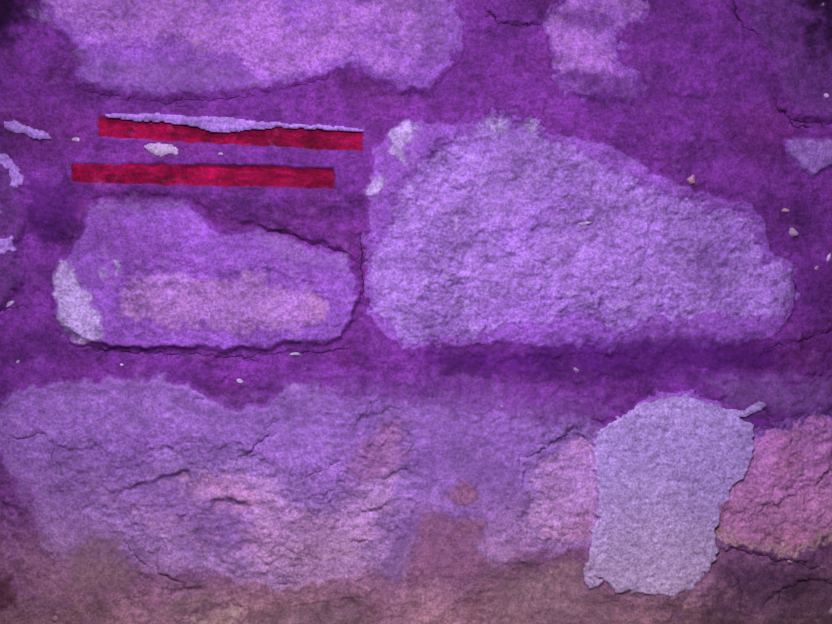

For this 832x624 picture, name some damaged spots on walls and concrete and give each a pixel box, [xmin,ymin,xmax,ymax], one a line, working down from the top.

crack [484,8,540,26]
spalling [542,0,651,104]
peeling [4,119,51,140]
peeling [0,153,25,188]
peeling [0,236,17,255]
crack [259,225,364,304]
peeling [720,401,766,417]
peeling [583,566,603,589]